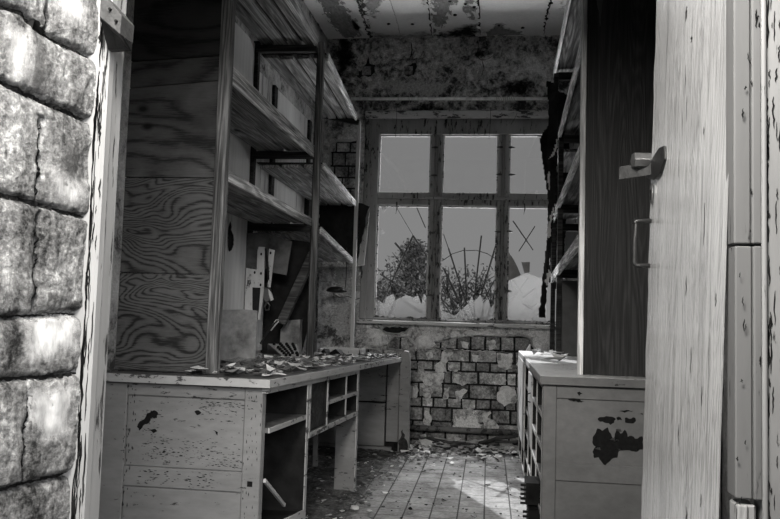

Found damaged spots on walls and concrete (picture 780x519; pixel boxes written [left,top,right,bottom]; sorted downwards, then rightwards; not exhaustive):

peeling [310,0,375,38]
peeling [421,0,487,39]
leakage [412,23,522,37]
leakage [337,39,353,73]
leakage [502,80,531,94]
flaking render [328,138,363,203]
flaking render [217,324,536,441]